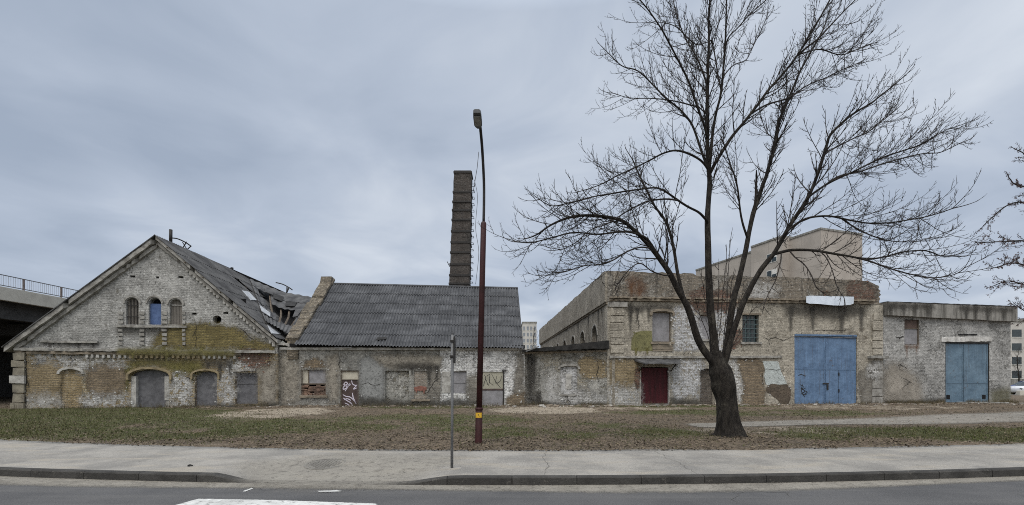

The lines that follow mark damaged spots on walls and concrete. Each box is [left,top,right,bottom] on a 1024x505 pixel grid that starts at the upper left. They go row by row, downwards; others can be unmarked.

damp [750,282,865,328]
spalling [668,287,791,404]
spalling [24,358,61,406]
spalling [85,362,127,400]
spalling [578,356,641,389]